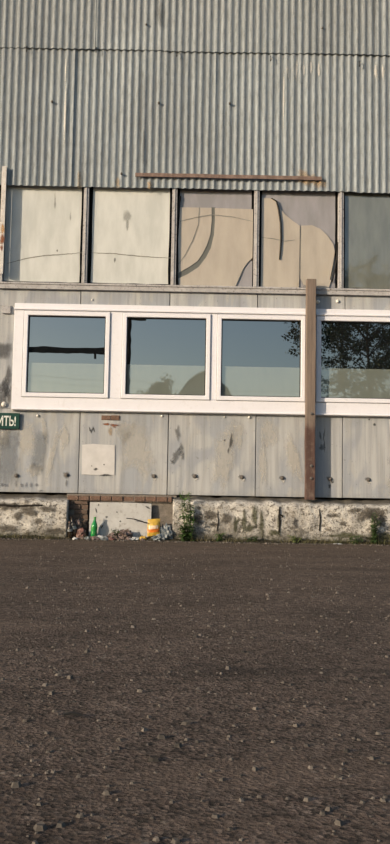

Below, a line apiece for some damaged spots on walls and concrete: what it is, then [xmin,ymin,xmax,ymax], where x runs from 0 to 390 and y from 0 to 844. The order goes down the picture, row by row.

leakage [234,507,279,534]